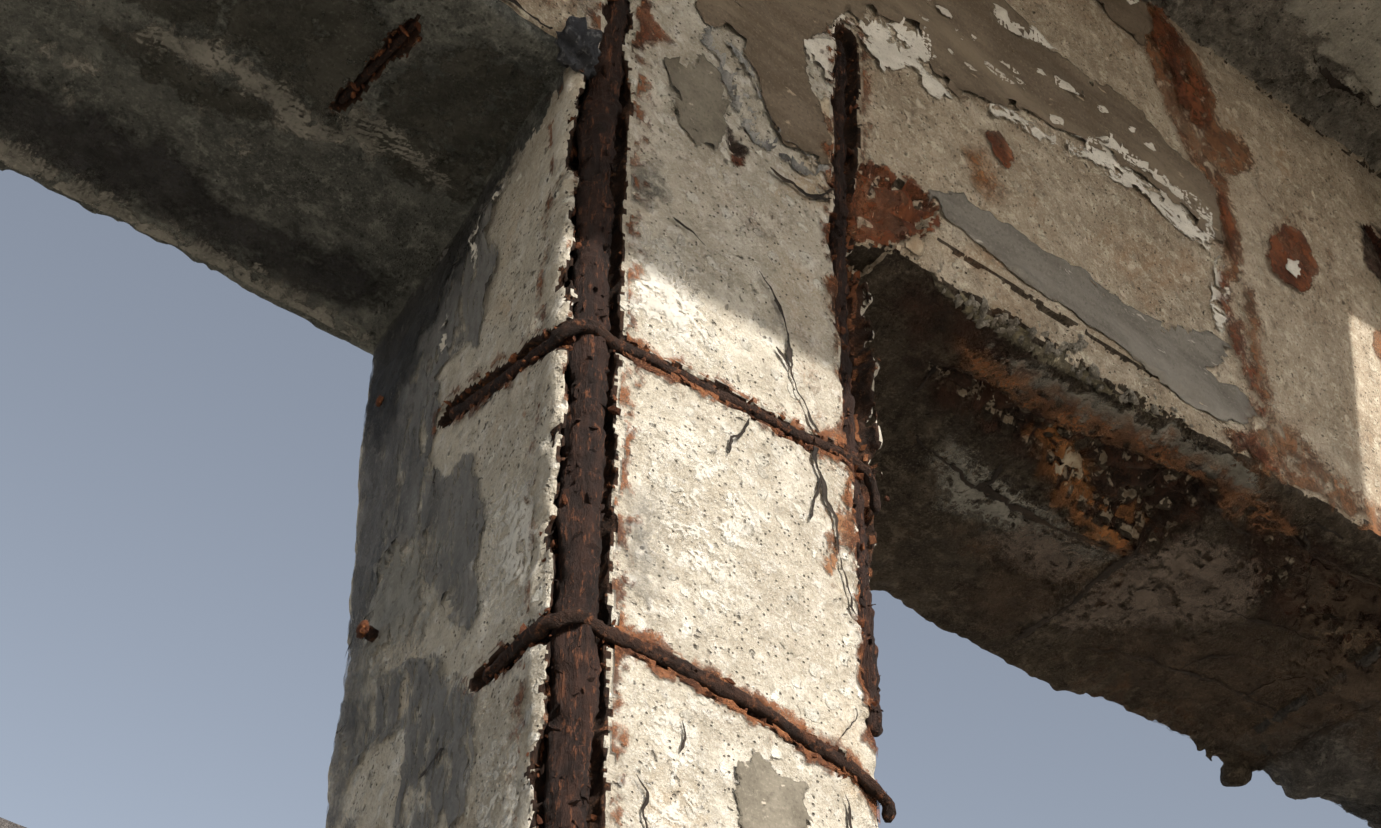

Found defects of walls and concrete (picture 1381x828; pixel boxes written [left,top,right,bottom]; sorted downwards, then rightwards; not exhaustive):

damp [0,0,548,828]
corrosion [431,329,575,436]
corrosion [568,314,880,575]
crack [759,271,856,614]
corrosion [829,161,942,316]
peeling [695,0,1257,755]
corrosion [967,130,1015,198]
corrosion [898,282,1298,559]
corrosion [1140,0,1381,536]
corrosion [605,618,893,823]